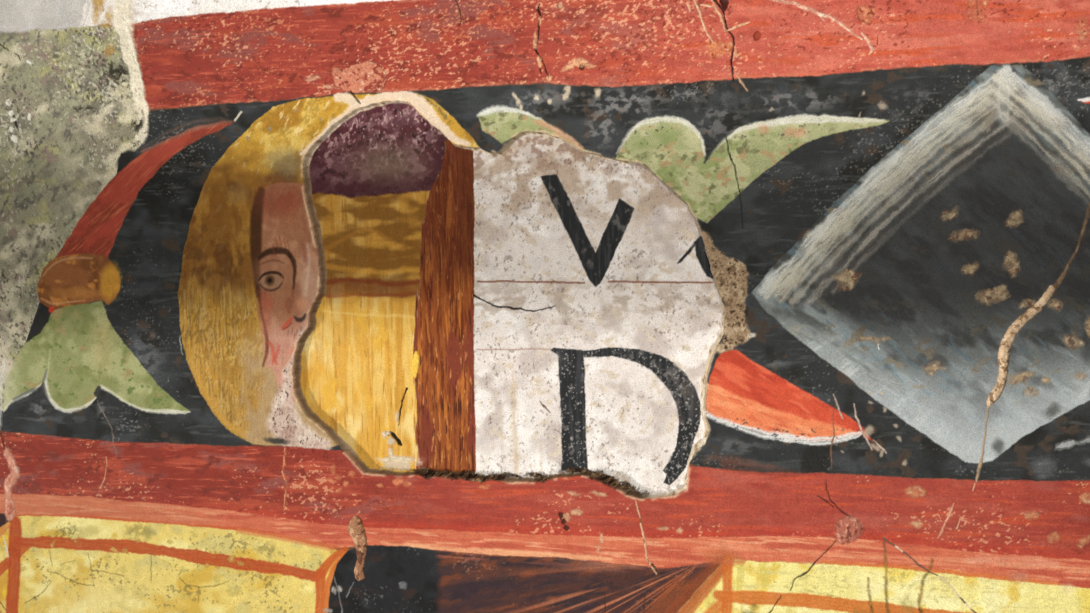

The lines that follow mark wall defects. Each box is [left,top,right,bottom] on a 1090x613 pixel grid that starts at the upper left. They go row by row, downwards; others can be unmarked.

crack [714,0,735,81]
flaking render [0,24,143,411]
flaking render [292,100,754,499]
peeling [837,270,857,289]
peeling [977,286,1007,304]
peeling [1005,253,1018,275]
crack [818,424,852,518]
crack [976,406,989,482]
peeling [559,510,582,530]
crack [769,541,836,613]
crack [883,537,976,613]